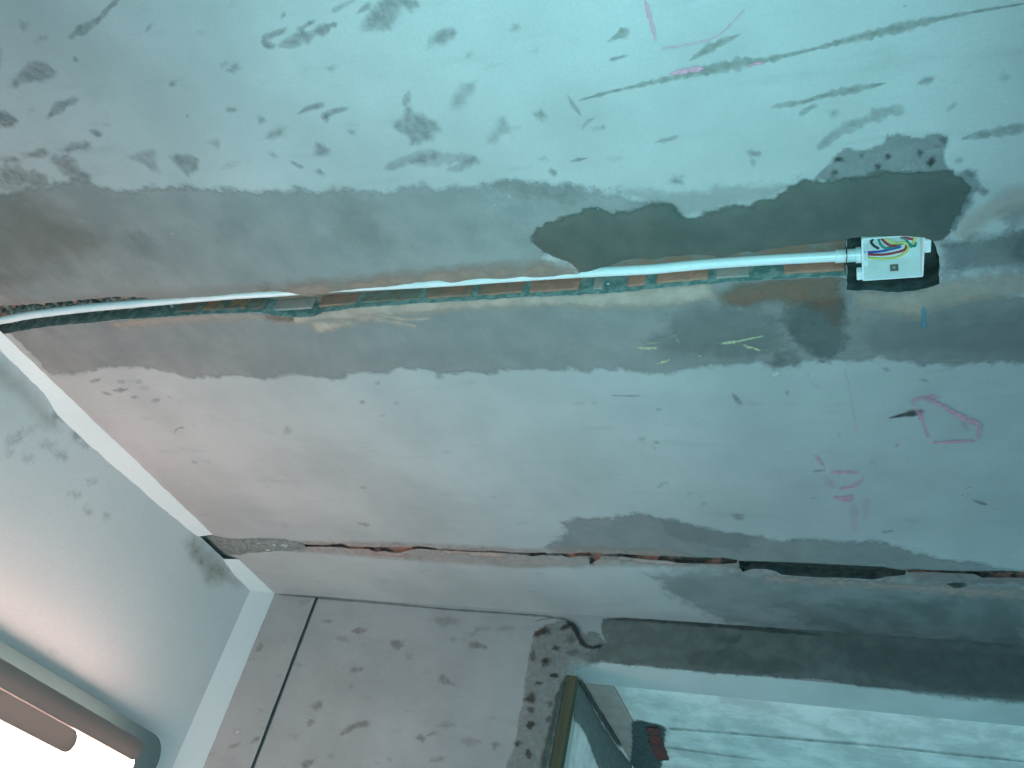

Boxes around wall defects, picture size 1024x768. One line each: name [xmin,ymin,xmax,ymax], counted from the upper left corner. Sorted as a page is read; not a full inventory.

water stain [0,178,665,306]
spalling [847,237,861,249]
spalling [924,240,937,264]
rust [724,277,842,306]
water stain [12,277,1024,379]
spalling [204,535,306,557]
crack [332,543,912,572]
water stain [352,514,1024,599]
crack [958,568,1024,576]
water stain [587,618,1024,704]
spalling [507,622,604,768]